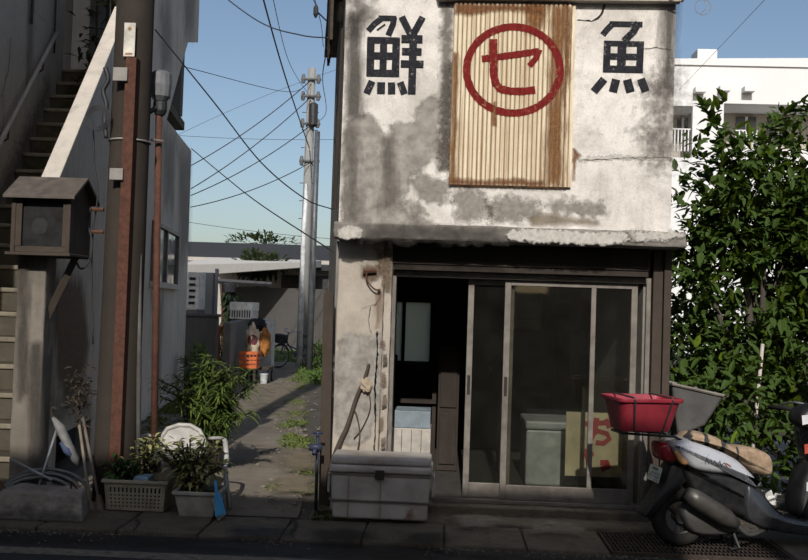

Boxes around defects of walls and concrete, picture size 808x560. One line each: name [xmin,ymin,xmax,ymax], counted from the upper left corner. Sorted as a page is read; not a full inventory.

leakage [347,15,361,117]
leakage [437,3,452,170]
rust [449,2,571,187]
peeling [338,96,684,246]
crack [578,4,605,22]
crack [578,154,673,162]